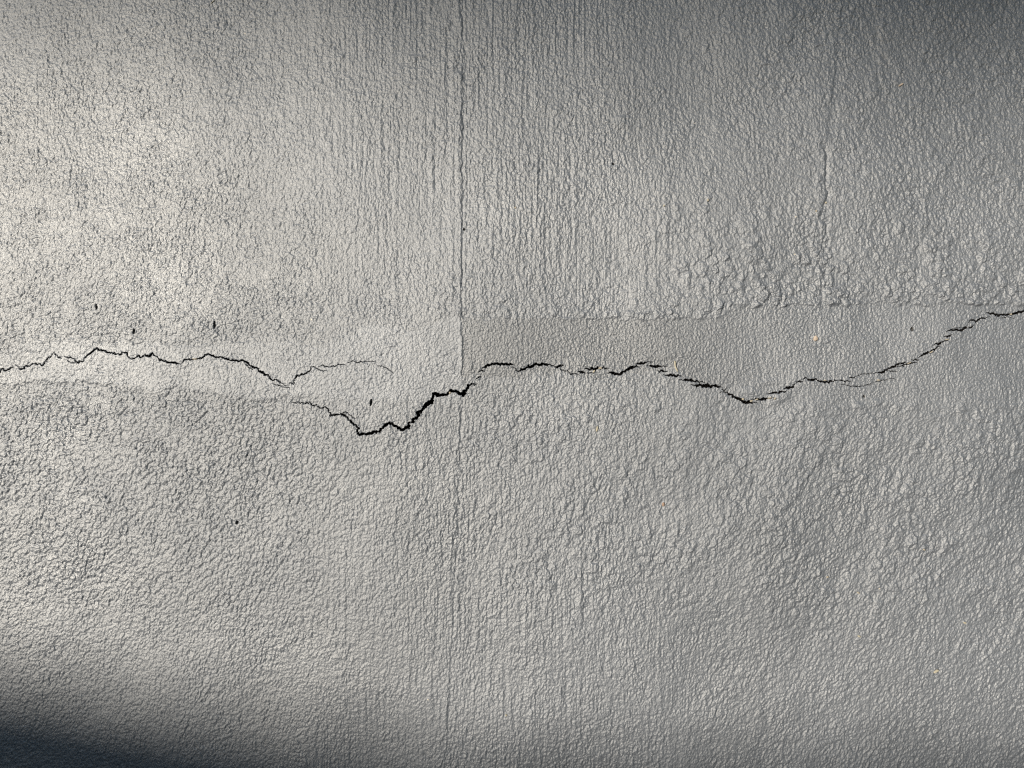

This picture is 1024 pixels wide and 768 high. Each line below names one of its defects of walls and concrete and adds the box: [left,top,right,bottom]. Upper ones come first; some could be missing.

crack [0,310,1024,436]